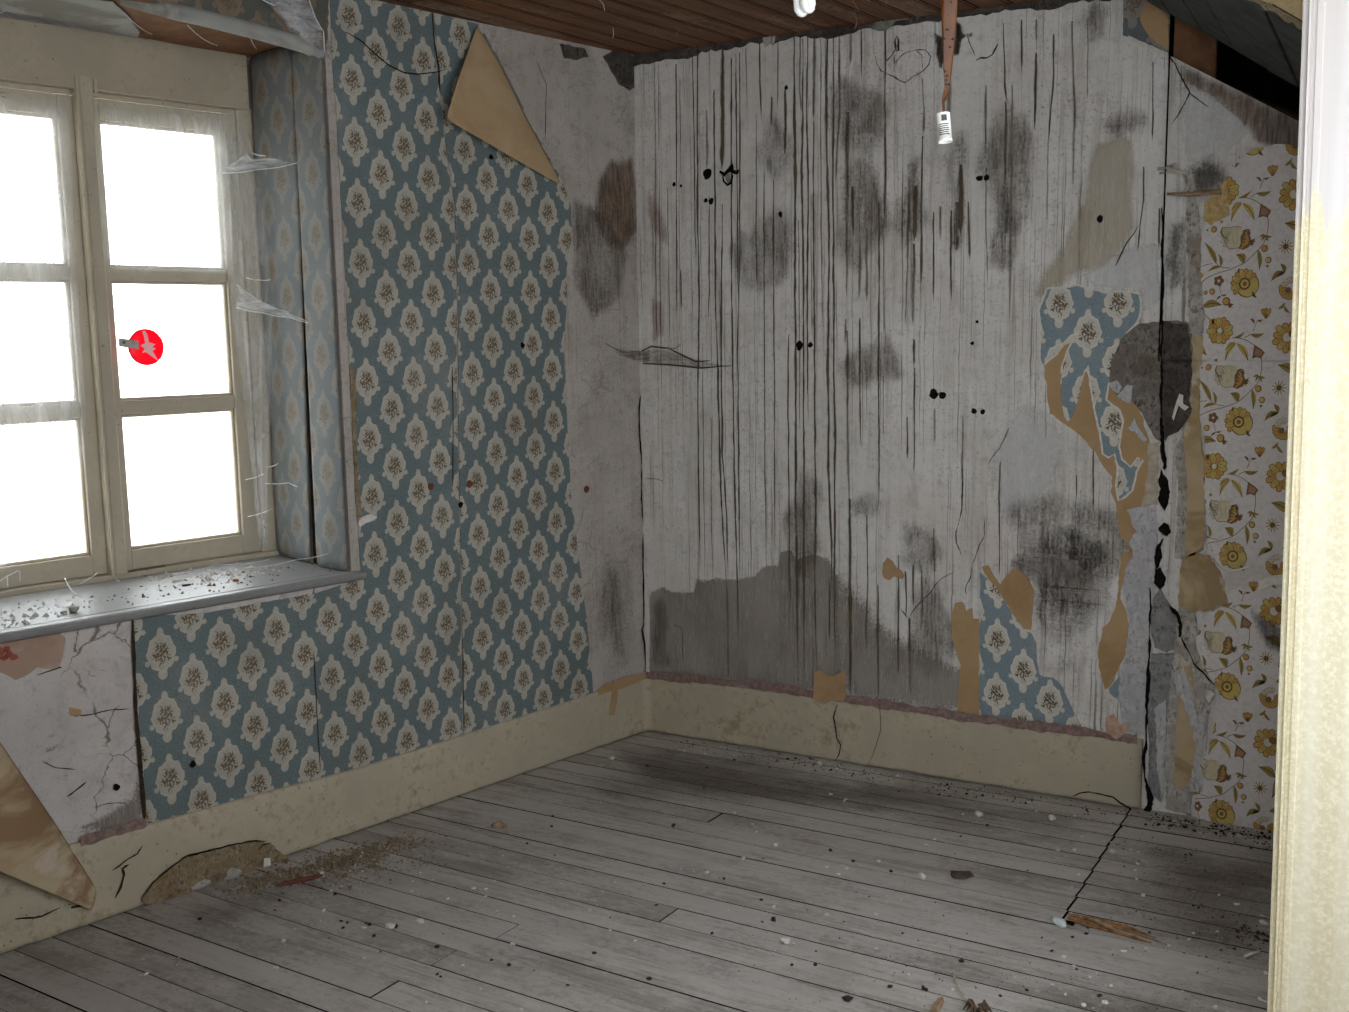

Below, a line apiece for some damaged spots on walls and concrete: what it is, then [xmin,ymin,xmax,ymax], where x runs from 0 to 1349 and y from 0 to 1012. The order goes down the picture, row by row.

damp [576,204,623,314]
damp [901,19,1055,320]
damp [1071,7,1101,175]
damp [1042,62,1154,291]
damp [1158,208,1183,288]
damp [649,29,960,710]
damp [998,450,1125,636]
crack [1074,208,1214,812]
spalling [1109,162,1230,816]
crack [42,761,122,808]
crack [74,709,125,717]
spalling [141,840,289,906]